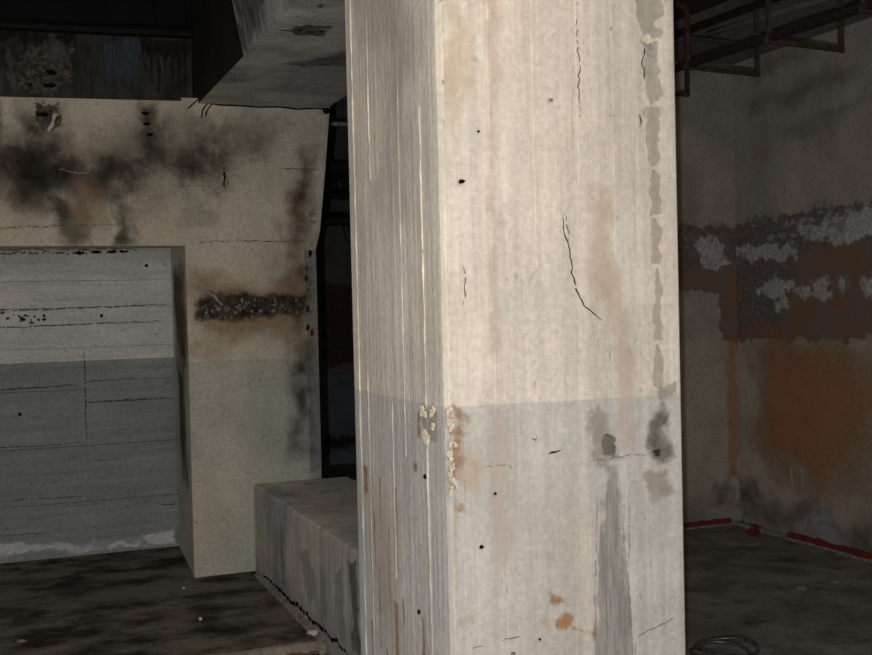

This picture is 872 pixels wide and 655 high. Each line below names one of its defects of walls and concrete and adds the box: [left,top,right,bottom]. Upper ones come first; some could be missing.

crack [563,217,602,320]
peeling [678,201,872,345]
peeling [202,250,354,471]
peeling [419,405,437,445]
water stain [648,412,672,461]
water stain [645,472,670,497]
water stain [594,466,633,655]
corrosion [387,599,404,655]
corrosion [556,614,572,629]